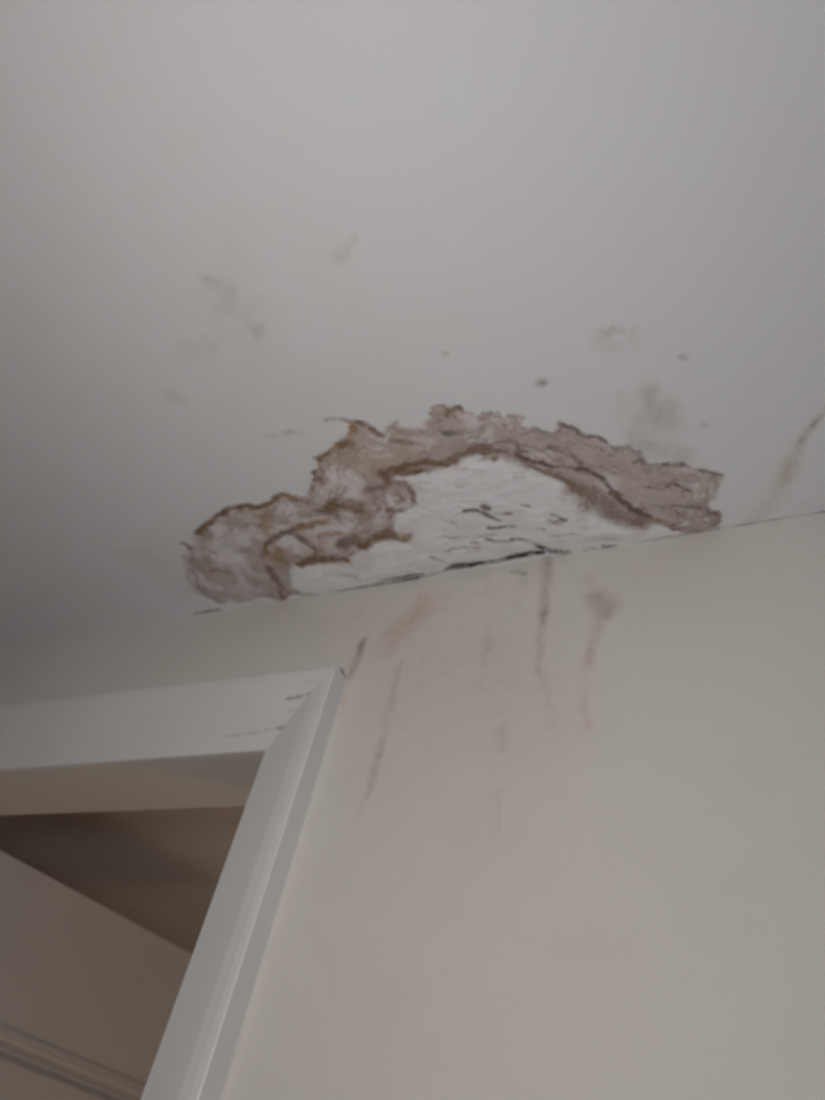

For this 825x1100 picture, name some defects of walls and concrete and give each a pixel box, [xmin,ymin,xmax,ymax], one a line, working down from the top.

peeling [181,404,722,604]